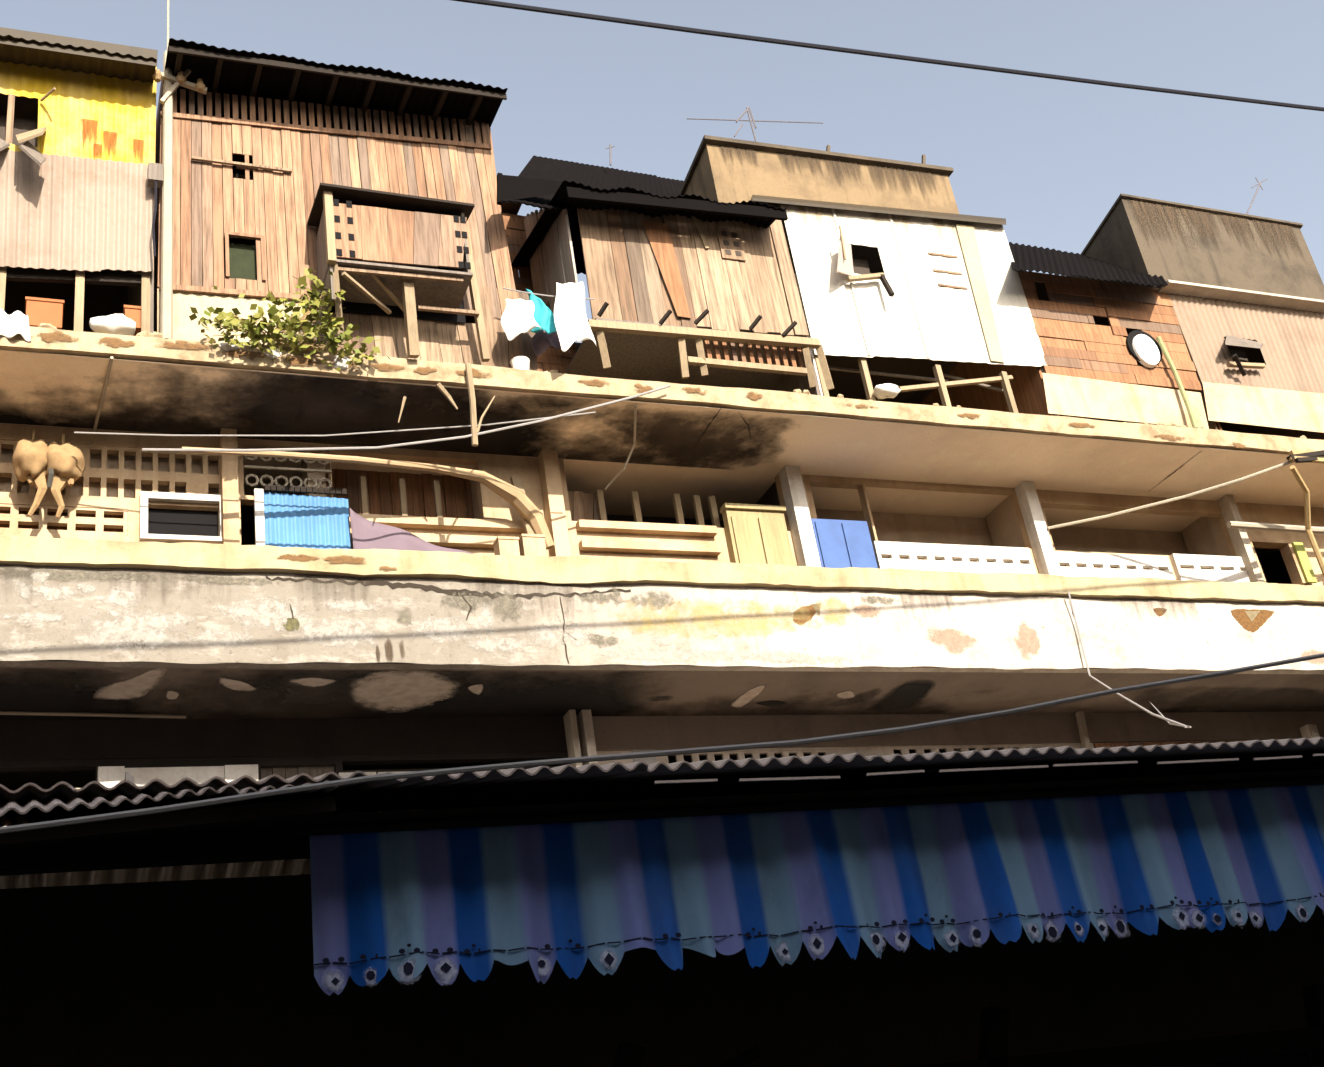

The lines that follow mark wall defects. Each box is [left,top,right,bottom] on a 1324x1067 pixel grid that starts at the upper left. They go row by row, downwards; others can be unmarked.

water stain [1130,199,1299,249]
water stain [558,413,785,469]
crack [266,576,631,664]
spalling [793,603,821,625]
spalling [1231,609,1275,632]